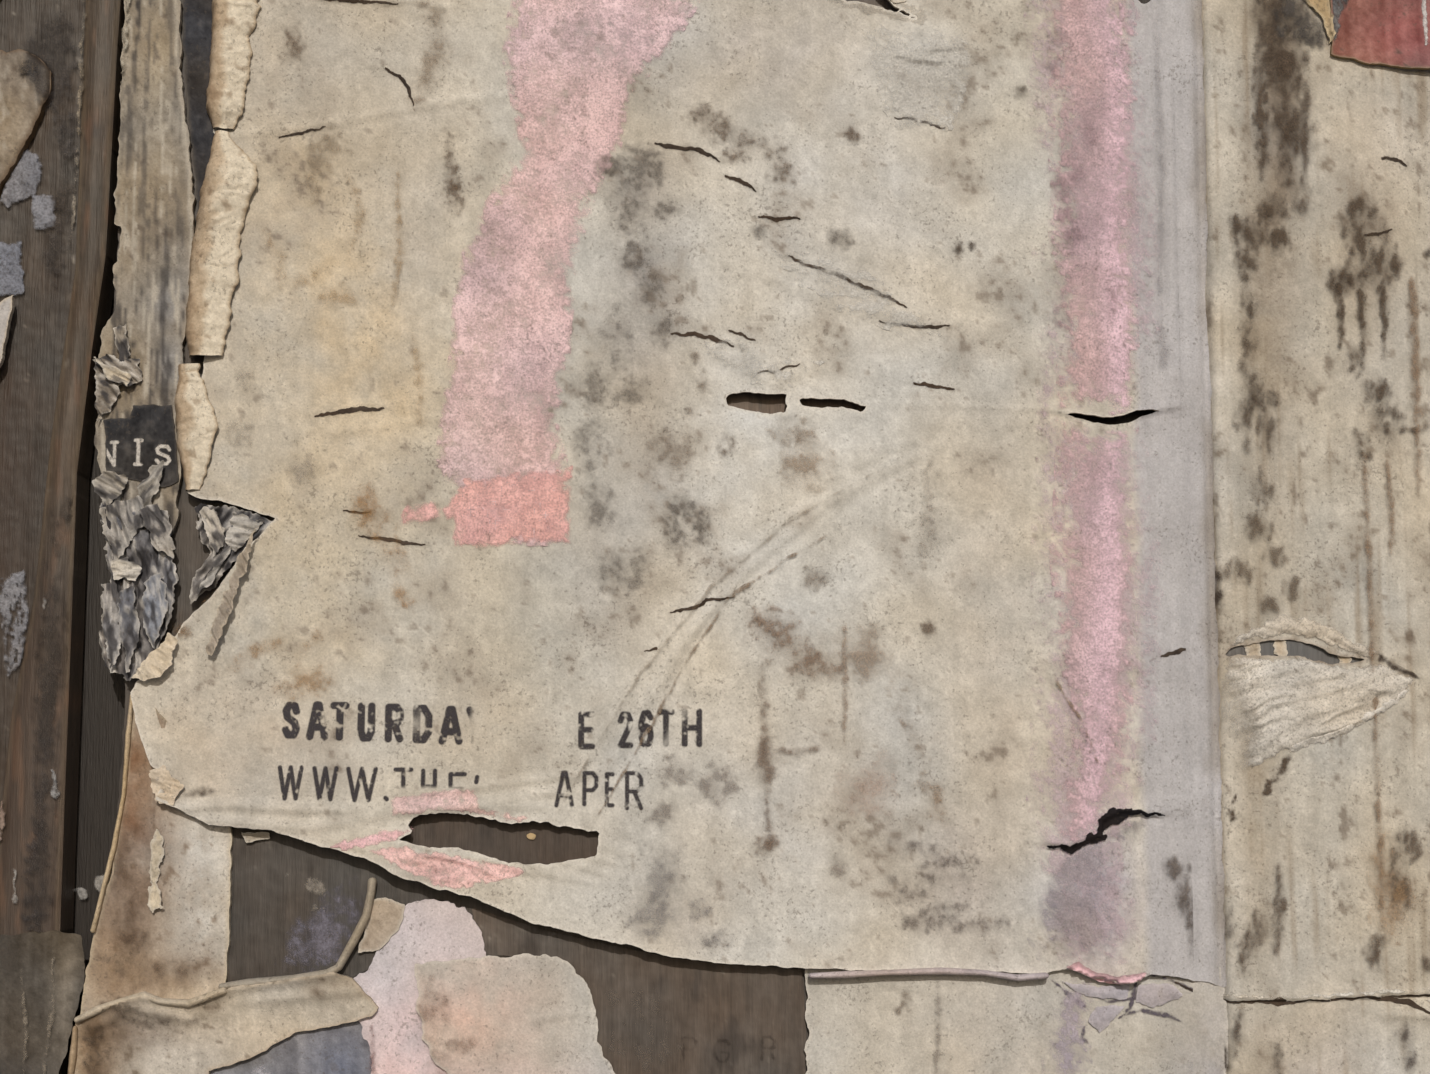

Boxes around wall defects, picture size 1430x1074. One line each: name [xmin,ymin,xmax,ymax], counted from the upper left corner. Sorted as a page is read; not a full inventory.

damp [1233,0,1323,279]
damp [1329,197,1422,472]
damp [1234,337,1278,451]
damp [1248,467,1283,564]
damp [1355,429,1394,531]
damp [1215,561,1252,605]
damp [1262,576,1300,610]
peeling [90,460,273,933]
peeling [68,827,1049,1074]
peeling [1067,962,1147,985]